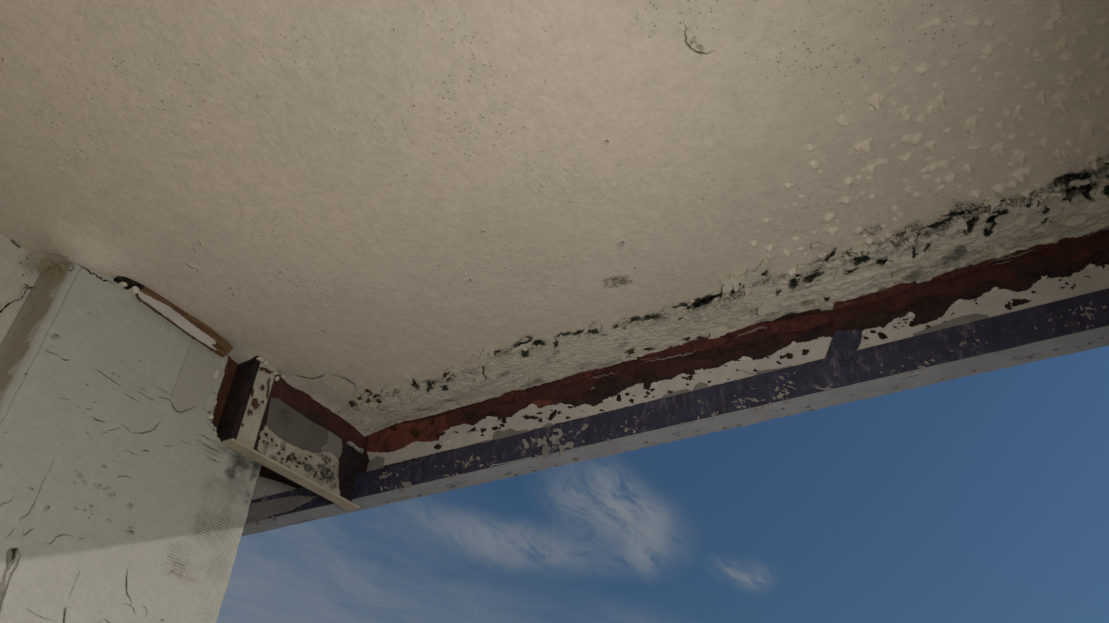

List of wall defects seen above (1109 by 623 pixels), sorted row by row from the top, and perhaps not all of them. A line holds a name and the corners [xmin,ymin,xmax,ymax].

crack [0,284,34,316]
flaking render [337,157,1109,436]
rust [635,281,941,384]
rust [932,227,1109,295]
crack [45,350,197,479]
spalling [204,355,238,435]
rust [367,390,561,453]
rust [555,368,619,396]
peeling [366,336,833,502]
crack [0,459,85,546]
peeling [245,476,318,525]
crack [105,568,148,623]